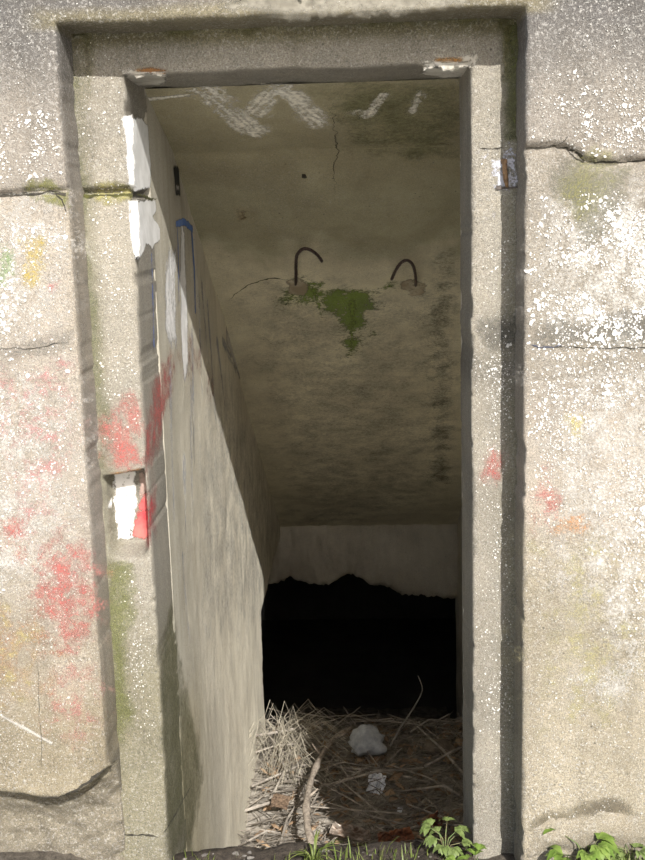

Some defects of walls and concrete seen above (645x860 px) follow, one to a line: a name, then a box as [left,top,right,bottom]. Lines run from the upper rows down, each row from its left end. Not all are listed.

crack [526,136,645,164]
crack [0,190,157,211]